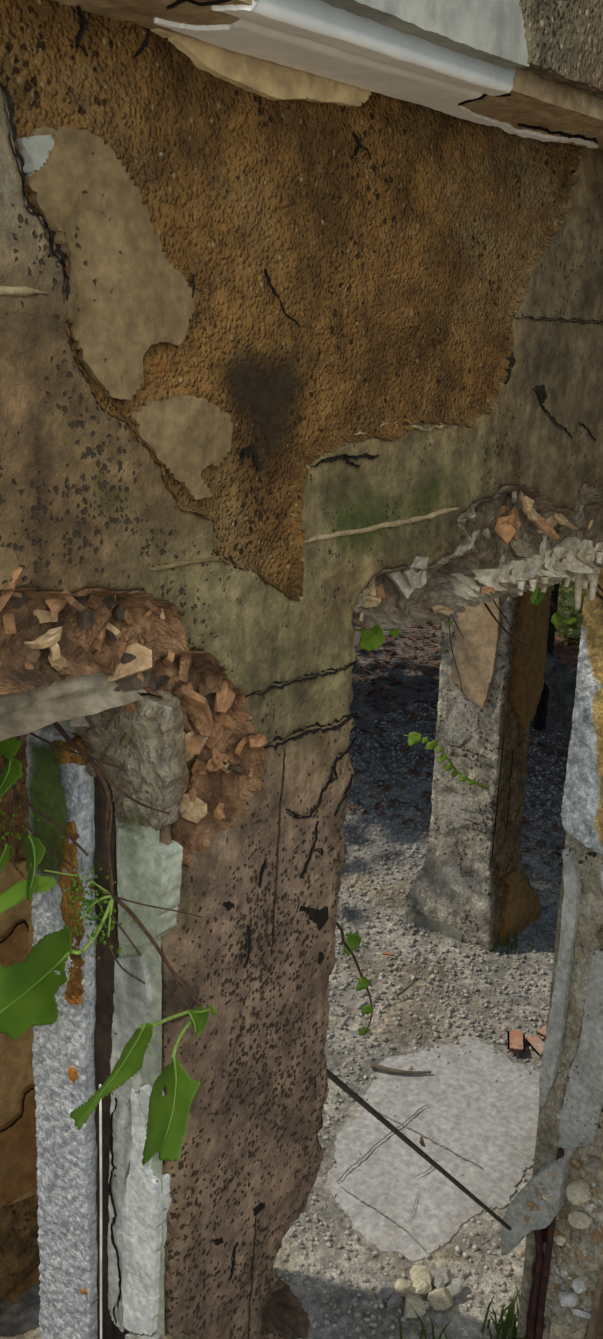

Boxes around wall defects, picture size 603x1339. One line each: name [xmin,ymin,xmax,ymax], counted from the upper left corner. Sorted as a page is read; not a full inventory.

crack [75,6,88,56]
crack [133,0,231,57]
peeling [519,0,603,98]
spalling [0,0,584,601]
leakage [223,357,305,453]
crack [533,389,596,441]
spalling [352,483,603,629]
crack [245,661,357,697]
rust [57,821,97,1005]
spalling [0,547,267,1339]
crack [244,713,359,967]
spalling [539,844,603,1339]